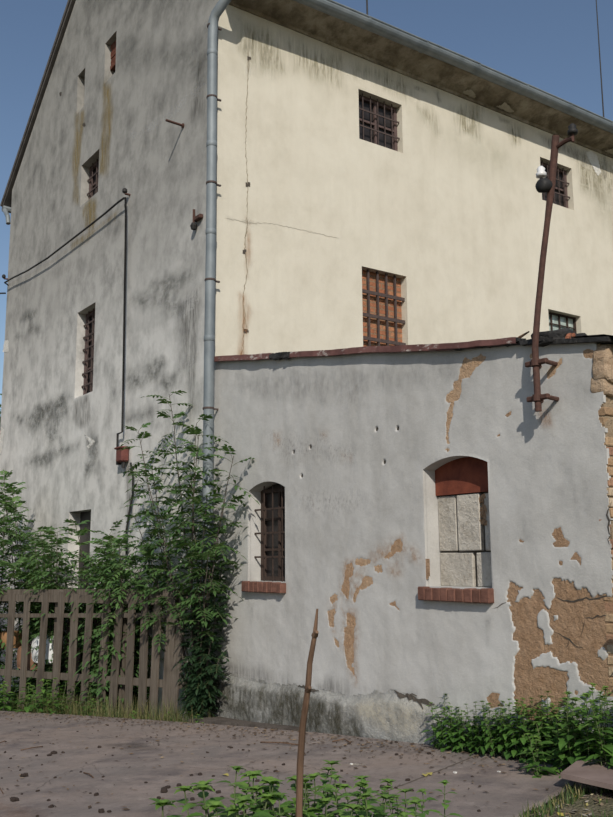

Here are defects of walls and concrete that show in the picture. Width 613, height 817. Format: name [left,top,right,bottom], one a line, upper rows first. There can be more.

crack [227,53,336,351]
flaking render [445,354,486,452]
flaking render [327,539,403,627]
flaking render [552,527,581,565]
flaking render [334,612,356,677]
flaking render [507,578,613,722]
water stain [217,682,360,737]
flaking render [487,692,504,708]